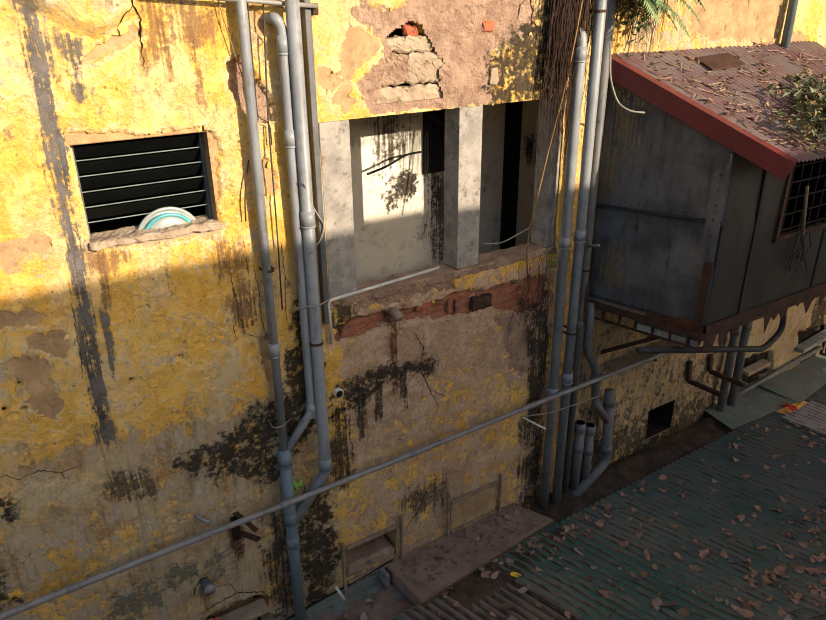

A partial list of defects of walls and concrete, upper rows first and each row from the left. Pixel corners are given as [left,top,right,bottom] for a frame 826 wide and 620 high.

crack [117,0,145,68]
spalling [226,59,246,113]
spalling [315,0,539,114]
leakage [9,0,116,447]
leakage [367,114,444,262]
peeling [0,303,70,422]
leakage [214,237,257,329]
leakage [173,293,317,486]
crack [406,329,445,408]
spalling [332,275,548,377]
crack [2,464,82,496]
leakage [298,353,439,606]